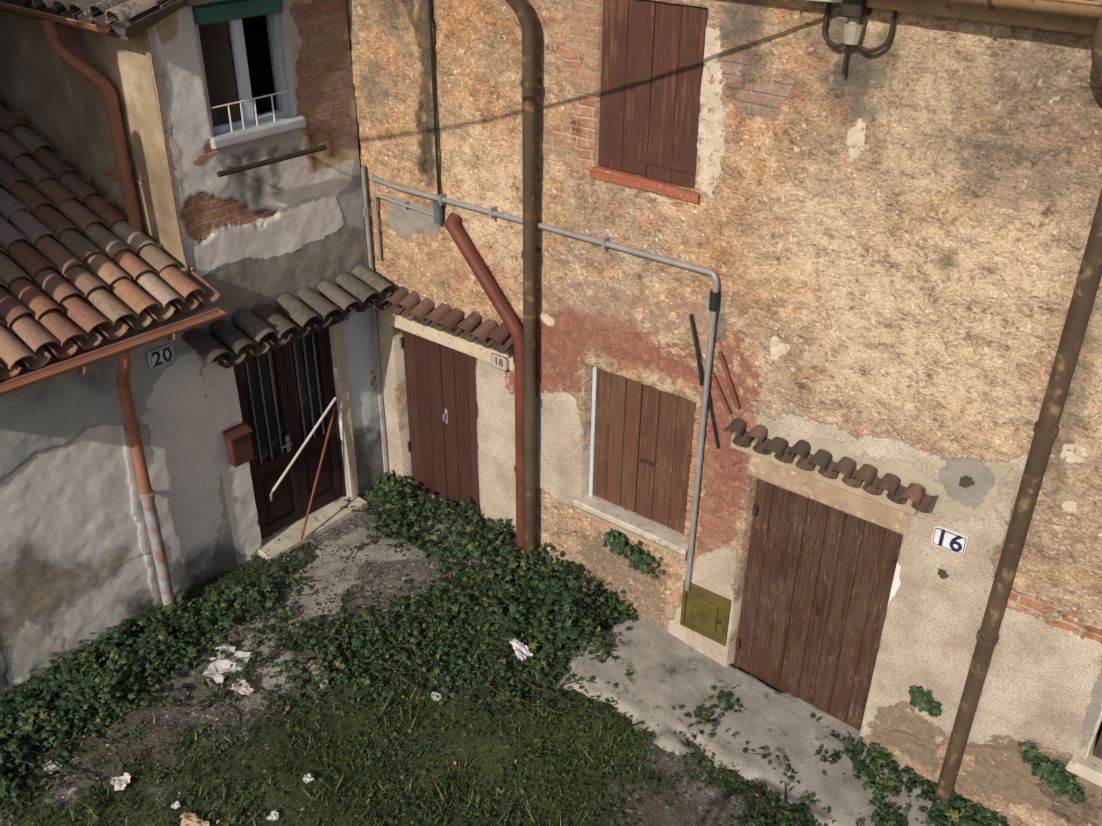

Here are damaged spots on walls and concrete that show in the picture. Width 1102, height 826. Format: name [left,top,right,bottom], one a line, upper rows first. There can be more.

flaking render [145,25,277,242]
flaking render [290,0,358,160]
water stain [405,0,436,180]
flaking render [0,424,158,684]
flaking render [139,351,261,593]
peeling [536,275,762,559]
flaking render [1006,589,1102,750]